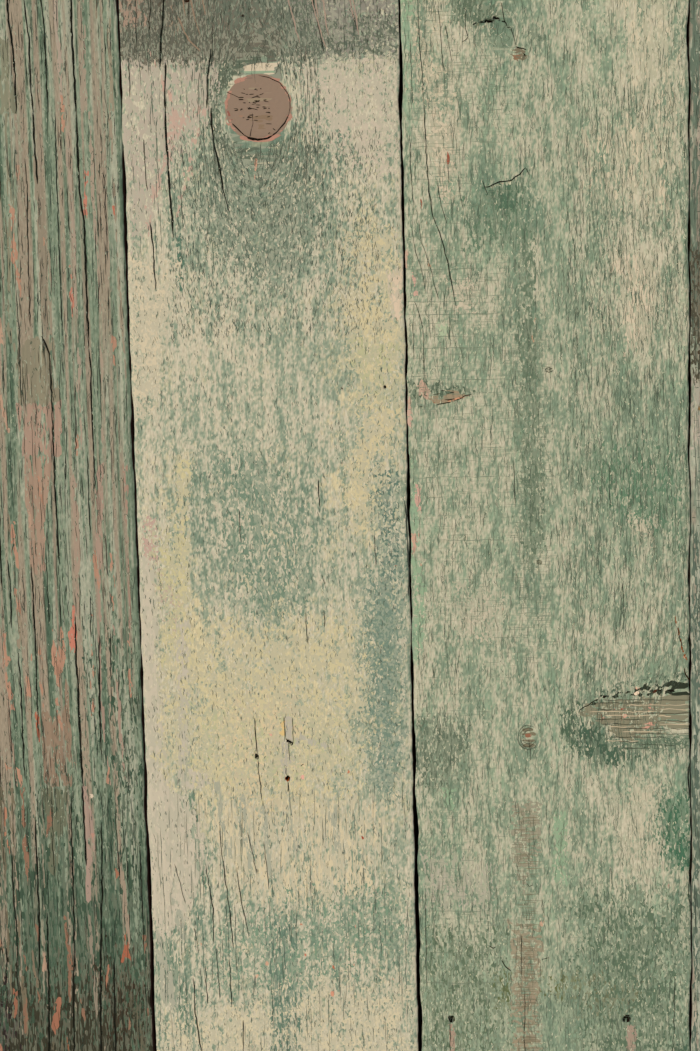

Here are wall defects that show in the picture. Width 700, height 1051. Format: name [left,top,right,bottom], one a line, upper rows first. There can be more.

damp [0,0,524,1051]
damp [690,0,700,388]